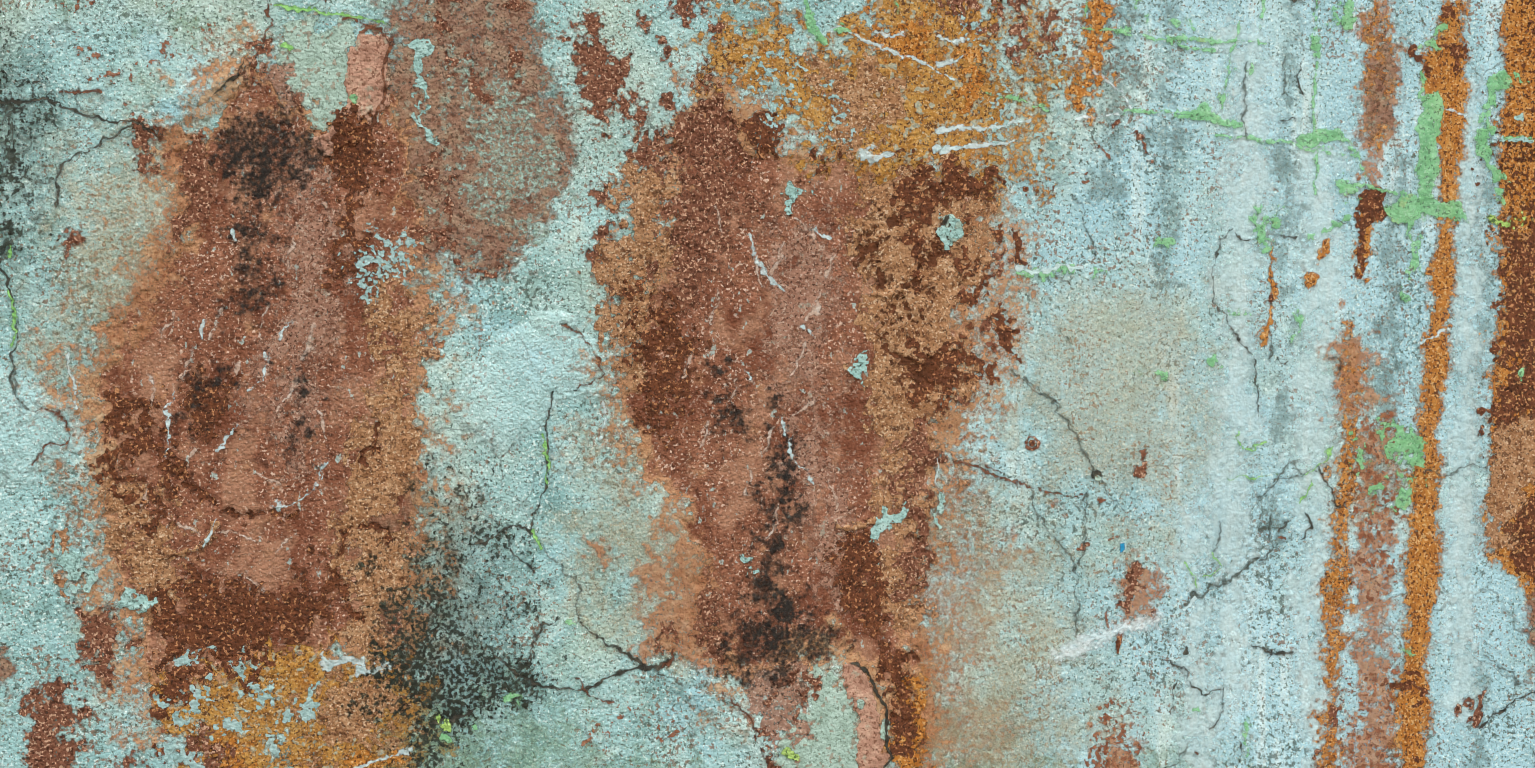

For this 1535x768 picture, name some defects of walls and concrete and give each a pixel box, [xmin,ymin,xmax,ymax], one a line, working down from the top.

rust [672,0,1154,215]
rust [58,227,86,259]
crack [0,81,162,466]
rust [98,123,200,364]
rust [1256,239,1279,347]
rust [1303,0,1535,768]
crack [475,324,683,704]
rust [582,506,736,668]
rust [147,606,460,768]
rust [581,706,682,765]
crack [722,691,800,766]
rust [1084,697,1149,768]